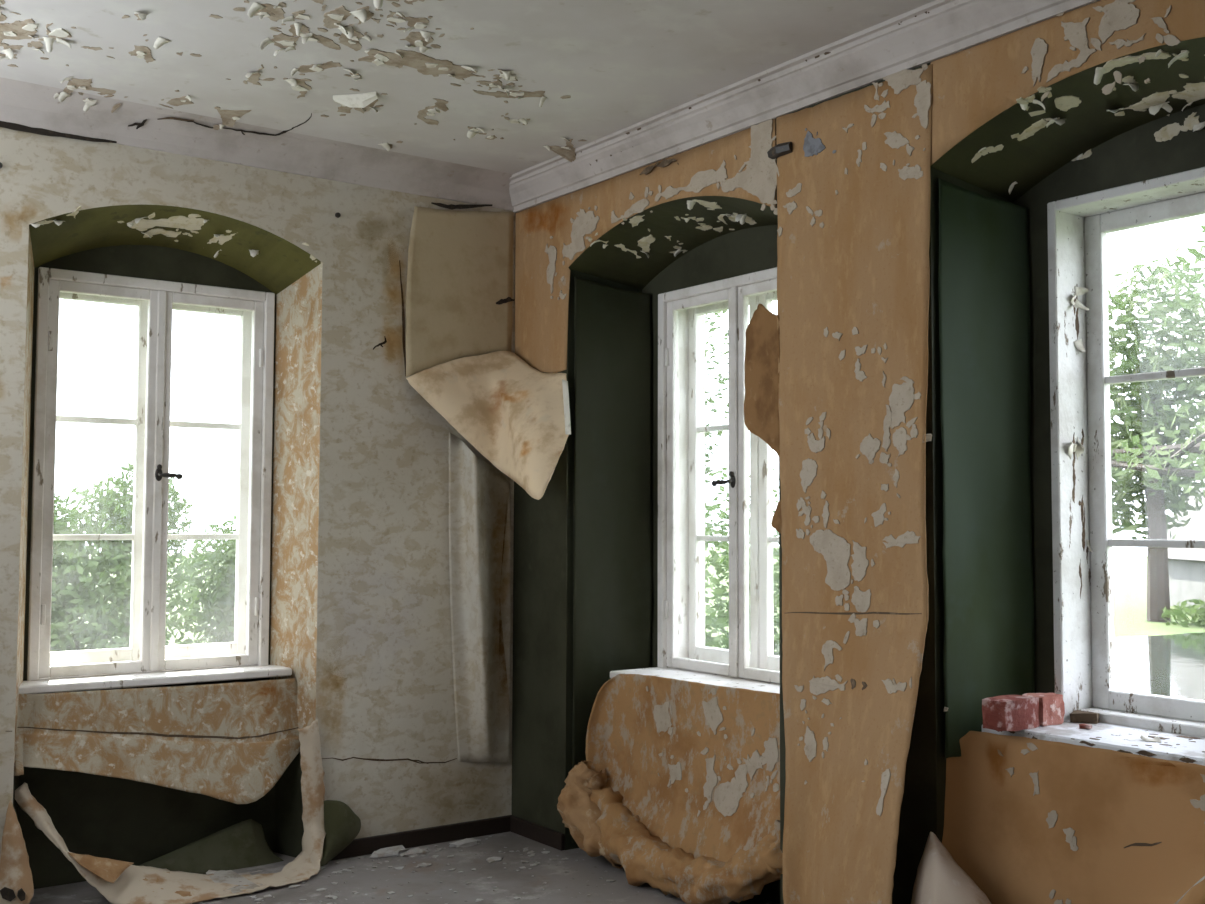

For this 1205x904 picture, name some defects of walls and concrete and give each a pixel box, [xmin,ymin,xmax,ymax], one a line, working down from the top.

peeling [0,0,202,67]
crack [0,113,312,143]
peeling [209,0,571,140]
peeling [864,59,938,180]
peeling [971,0,1205,163]
peeling [117,212,236,258]
peeling [543,119,824,300]
peeling [824,327,932,548]
peeling [794,412,880,762]
spalling [1021,693,1065,755]
spalling [1071,724,1102,746]
peeling [1118,734,1205,824]